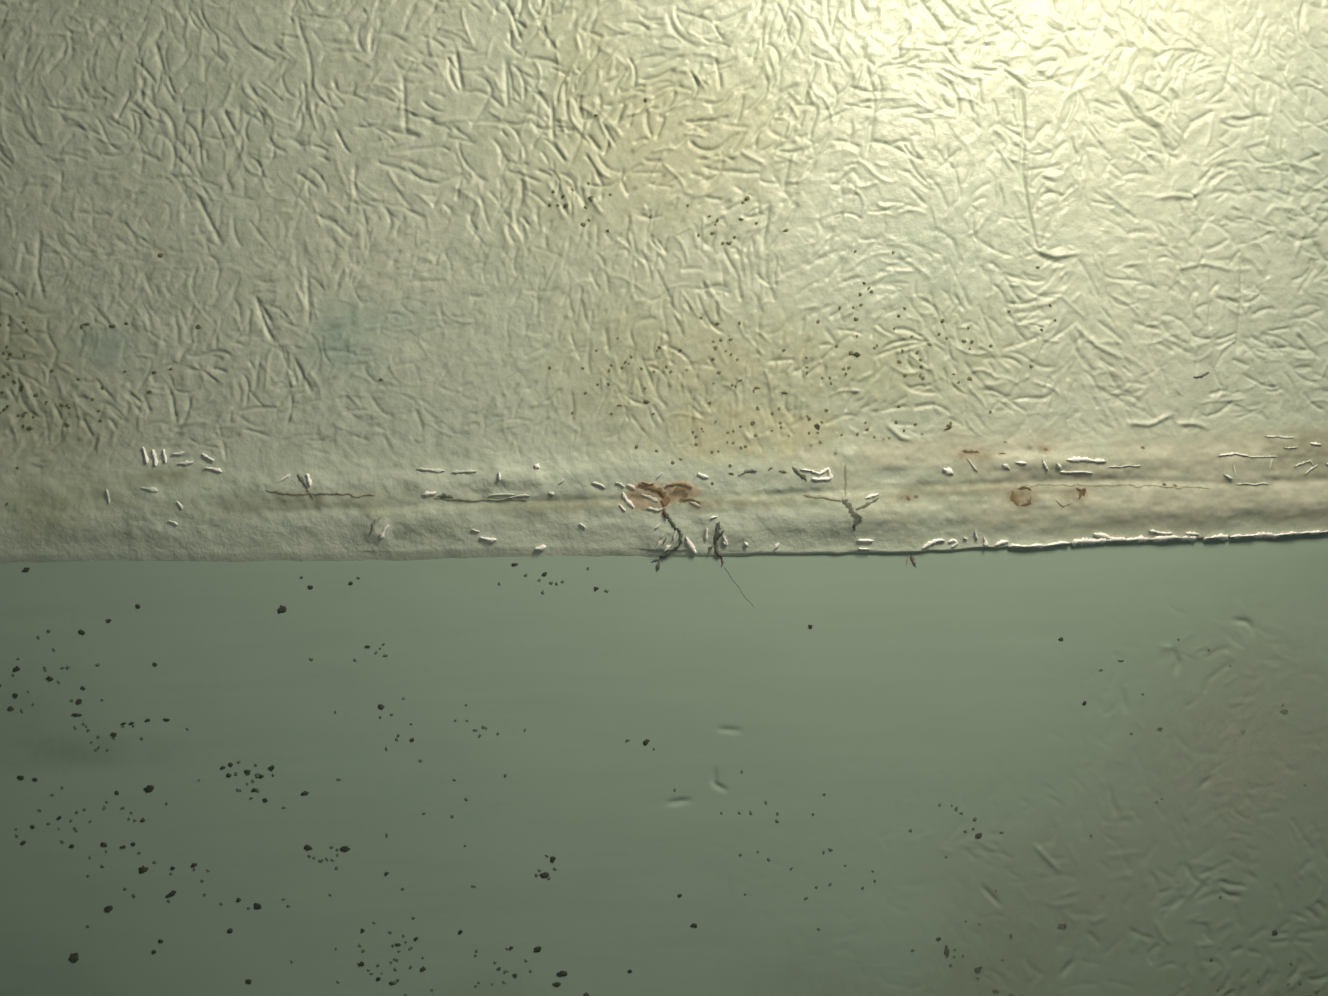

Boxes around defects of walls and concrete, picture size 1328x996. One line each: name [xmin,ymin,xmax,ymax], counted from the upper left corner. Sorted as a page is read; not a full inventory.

leakage [548,182,612,227]
leakage [805,282,878,385]
leakage [0,345,71,430]
leakage [671,316,1328,531]
rust [638,482,701,519]
crack [698,464,879,550]
rust [1010,486,1031,506]
crack [651,513,754,607]
leakage [70,686,170,751]
leakage [220,760,275,802]
mould [87,842,176,902]
mould [357,921,426,996]